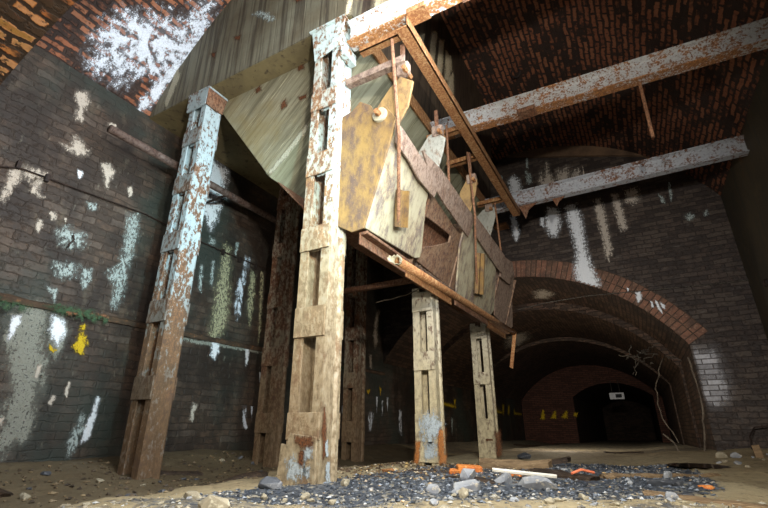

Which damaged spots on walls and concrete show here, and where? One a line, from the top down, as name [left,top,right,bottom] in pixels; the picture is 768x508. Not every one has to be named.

damp [87,0,217,111]
damp [73,91,91,122]
damp [0,166,48,203]
damp [101,163,115,188]
damp [35,211,87,251]
damp [47,260,93,299]
damp [105,212,140,311]
damp [183,162,264,364]
damp [540,203,600,288]
damp [592,186,642,262]
damp [0,300,71,462]
corrosion [294,406,327,466]